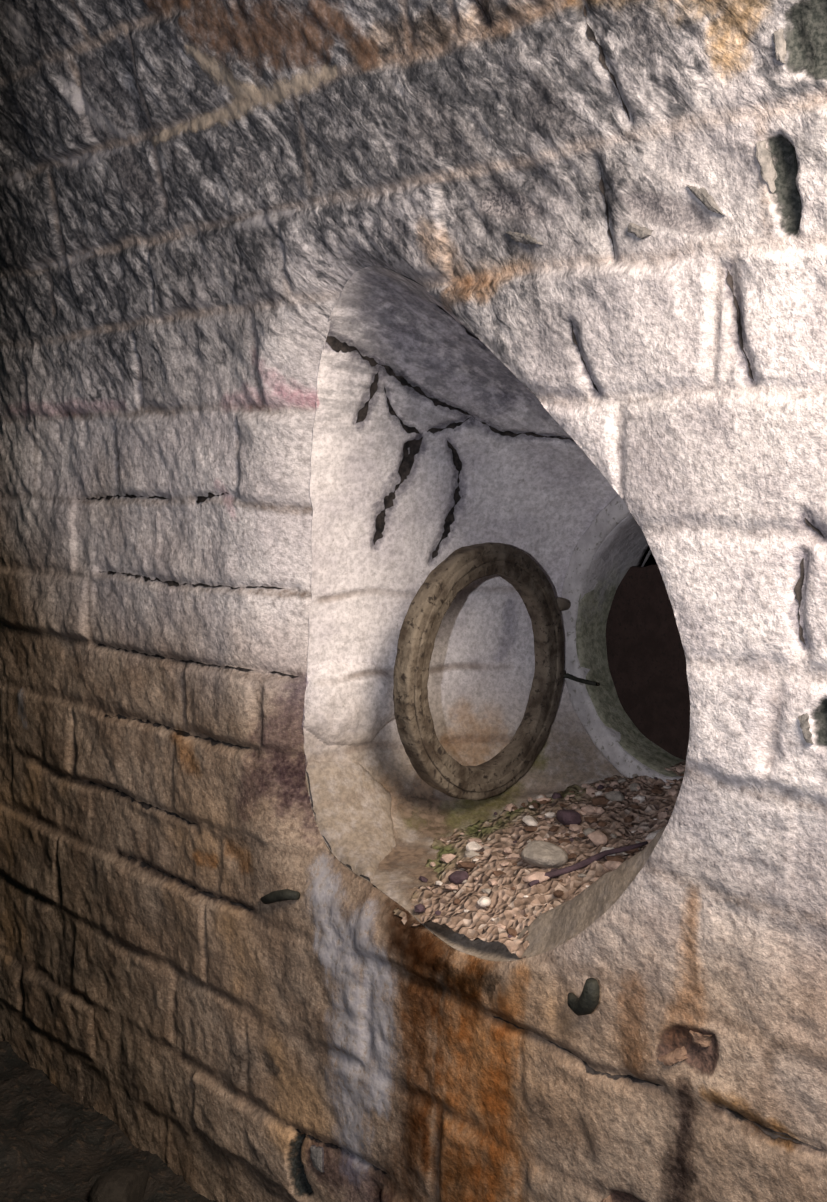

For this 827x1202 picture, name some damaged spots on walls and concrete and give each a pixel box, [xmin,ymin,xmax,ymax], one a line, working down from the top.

corrosion [150,0,376,68]
crack [437,305,481,341]
crack [324,331,575,559]
efflorescence [312,859,393,1182]
spalling [657,1024,719,1075]
water stain [670,1085,694,1202]
spalling [601,1190,643,1202]